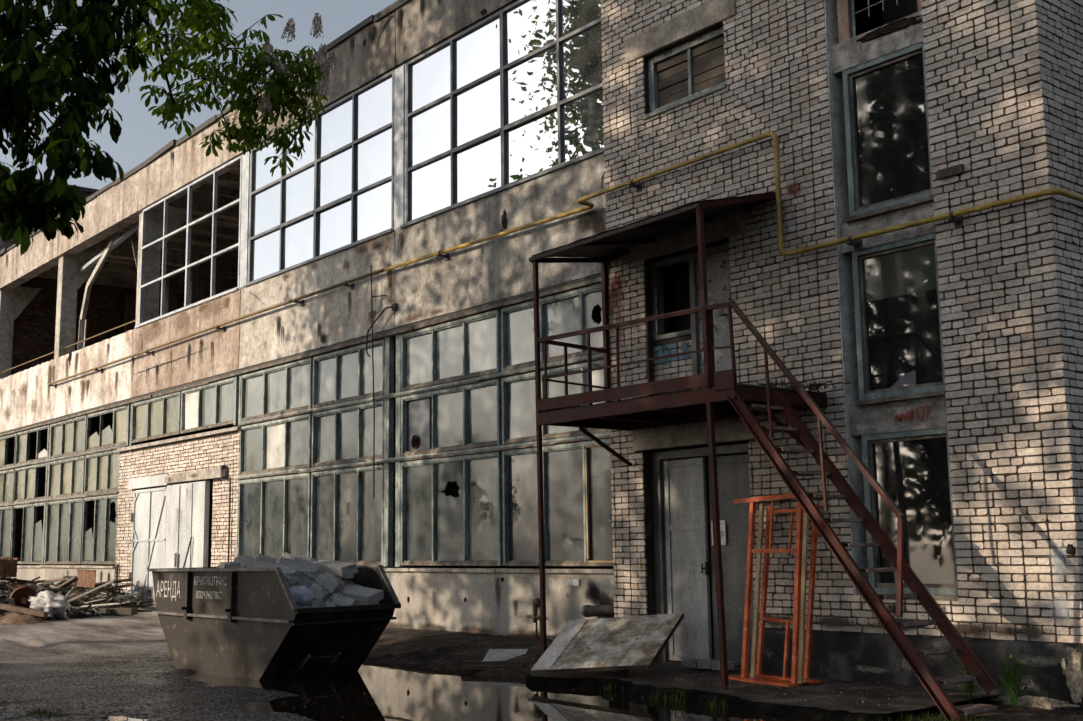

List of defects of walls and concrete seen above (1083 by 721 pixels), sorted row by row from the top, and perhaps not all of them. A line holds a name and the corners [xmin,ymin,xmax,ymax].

leakage [0,353,89,409]
leakage [131,325,170,382]
spalling [985,647,1083,709]